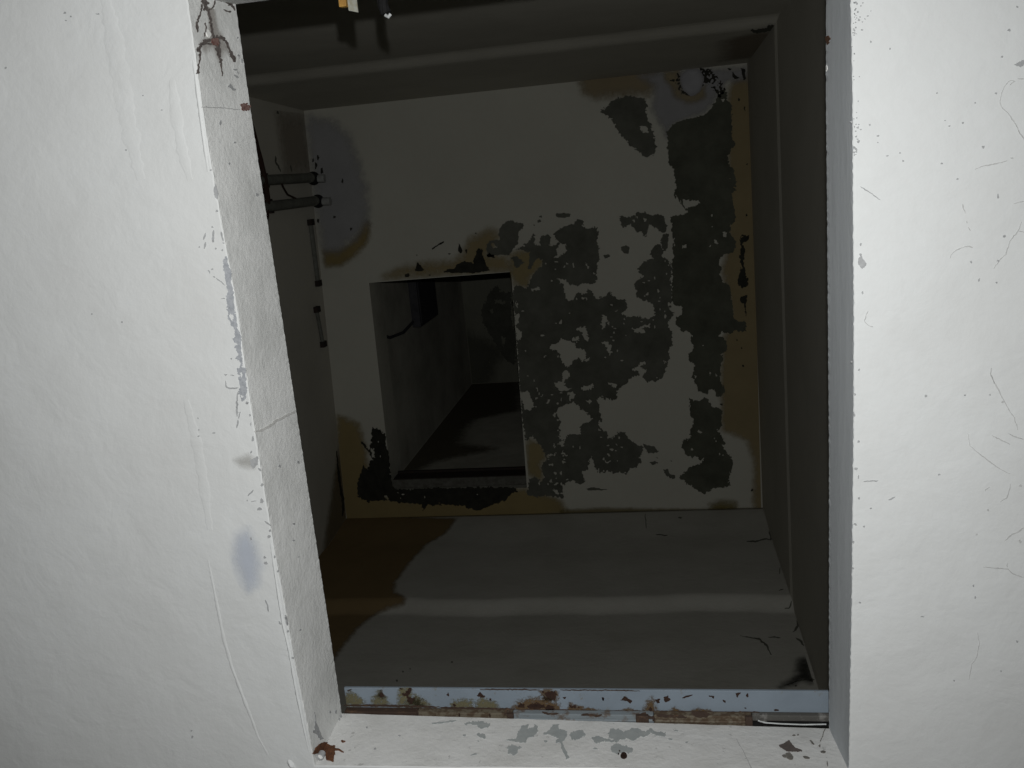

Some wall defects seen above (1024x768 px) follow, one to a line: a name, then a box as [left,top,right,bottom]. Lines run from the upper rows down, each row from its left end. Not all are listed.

damp [324,222,369,266]
peeling [481,90,749,499]
spalling [198,226,271,538]
corrosion [344,687,604,717]
corrosion [615,692,760,726]
peeling [506,724,678,760]